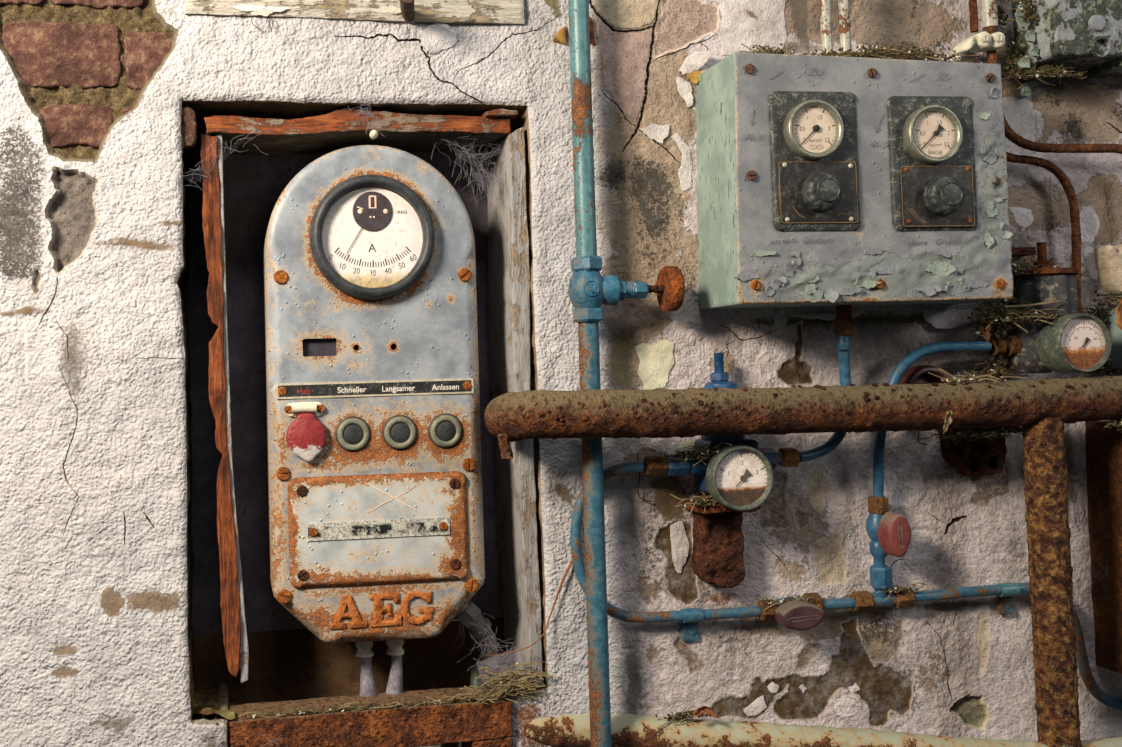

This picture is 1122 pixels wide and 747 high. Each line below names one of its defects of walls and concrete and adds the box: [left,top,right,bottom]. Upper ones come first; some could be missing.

spalling [0,0,179,300]
spalling [181,107,197,150]
crack [335,15,559,103]
crack [589,0,716,164]
peeling [1003,97,1035,142]
water stain [0,124,45,280]
water stain [599,155,675,237]
peeling [1010,207,1034,228]
crack [39,277,79,539]
peeling [635,340,674,390]
crack [928,513,966,534]
peeling [708,616,914,729]